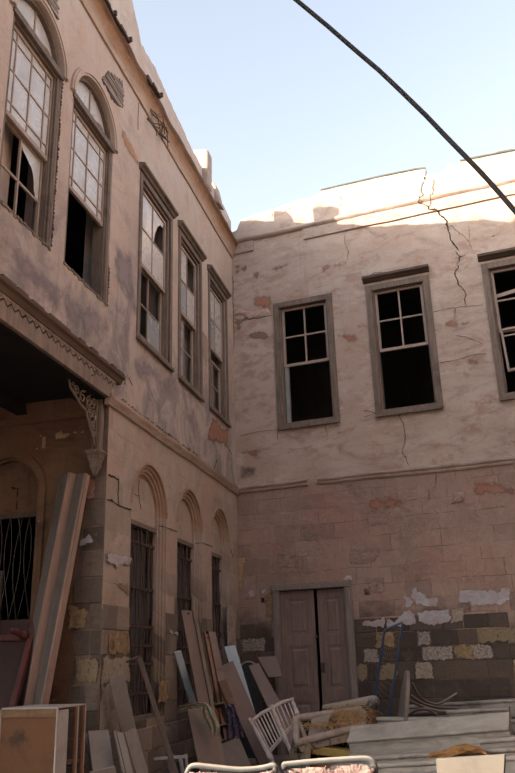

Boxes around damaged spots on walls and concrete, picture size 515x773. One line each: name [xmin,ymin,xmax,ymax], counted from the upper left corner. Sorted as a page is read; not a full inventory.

crack [418,176,479,312]
spalling [75,631,130,685]
peeling [357,587,515,682]